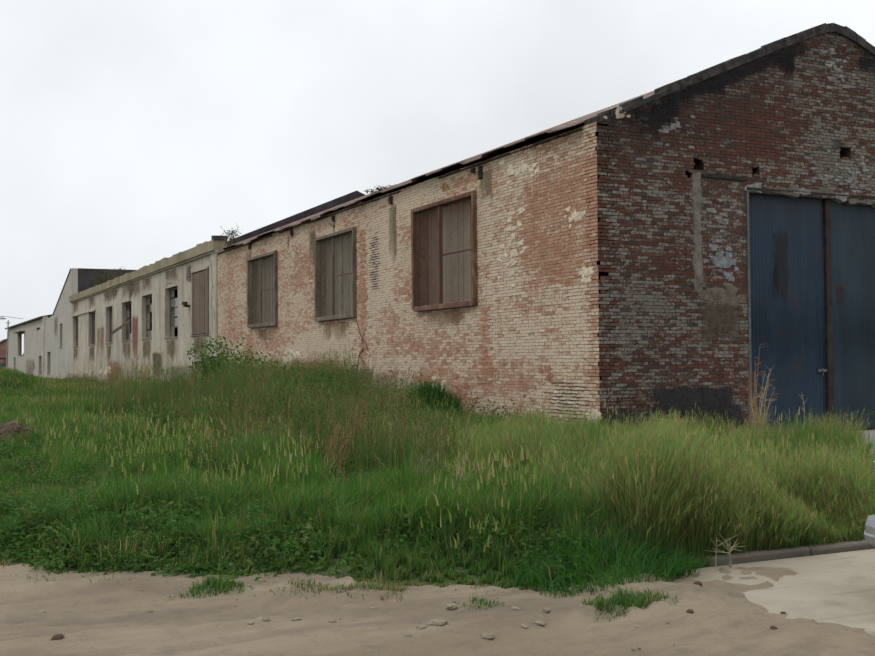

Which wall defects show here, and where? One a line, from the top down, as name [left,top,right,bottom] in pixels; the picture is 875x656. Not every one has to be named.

damp [819,44,875,89]
damp [635,43,804,146]
peeling [499,159,540,184]
peeling [564,206,586,228]
peeling [497,208,526,287]
flaking render [703,199,743,282]
peeling [578,266,594,283]
damp [588,386,743,430]